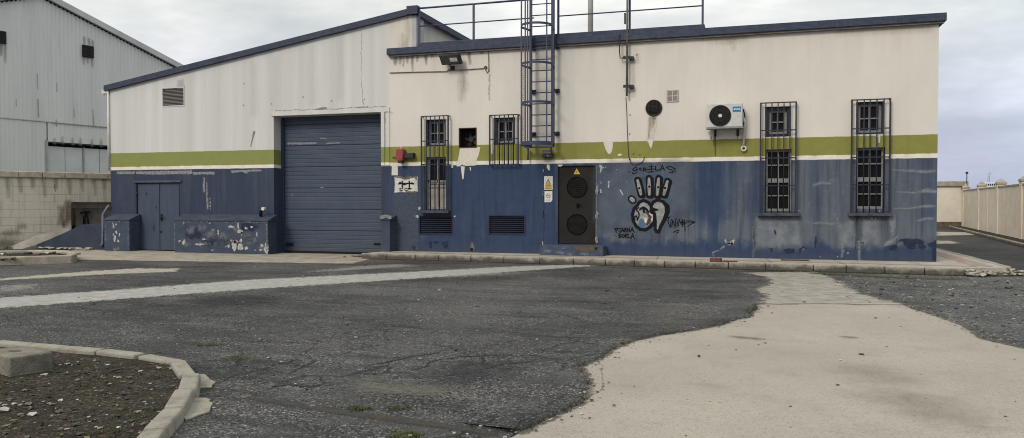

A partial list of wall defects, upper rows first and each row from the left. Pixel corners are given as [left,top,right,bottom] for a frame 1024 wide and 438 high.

peeling [451,144,493,179]
peeling [178,222,269,254]